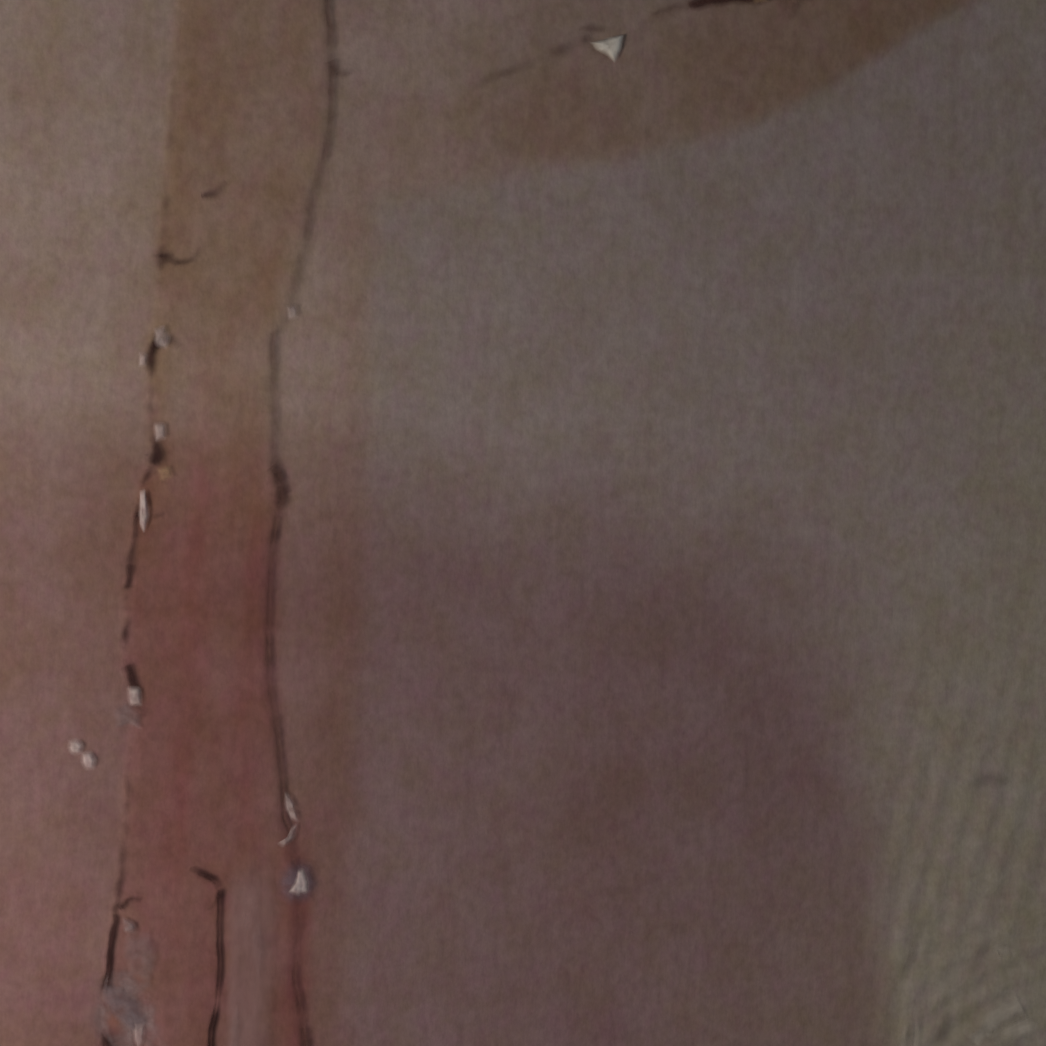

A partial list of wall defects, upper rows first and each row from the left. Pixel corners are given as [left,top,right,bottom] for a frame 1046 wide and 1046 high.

crack [689,0,762,8]
flaking render [595,36,623,60]
crack [140,333,163,369]
crack [150,444,162,465]
crack [134,493,147,537]
crack [271,472,285,542]
crack [124,564,132,588]
crack [125,666,138,700]
crack [102,904,134,988]
crack [196,871,221,1046]